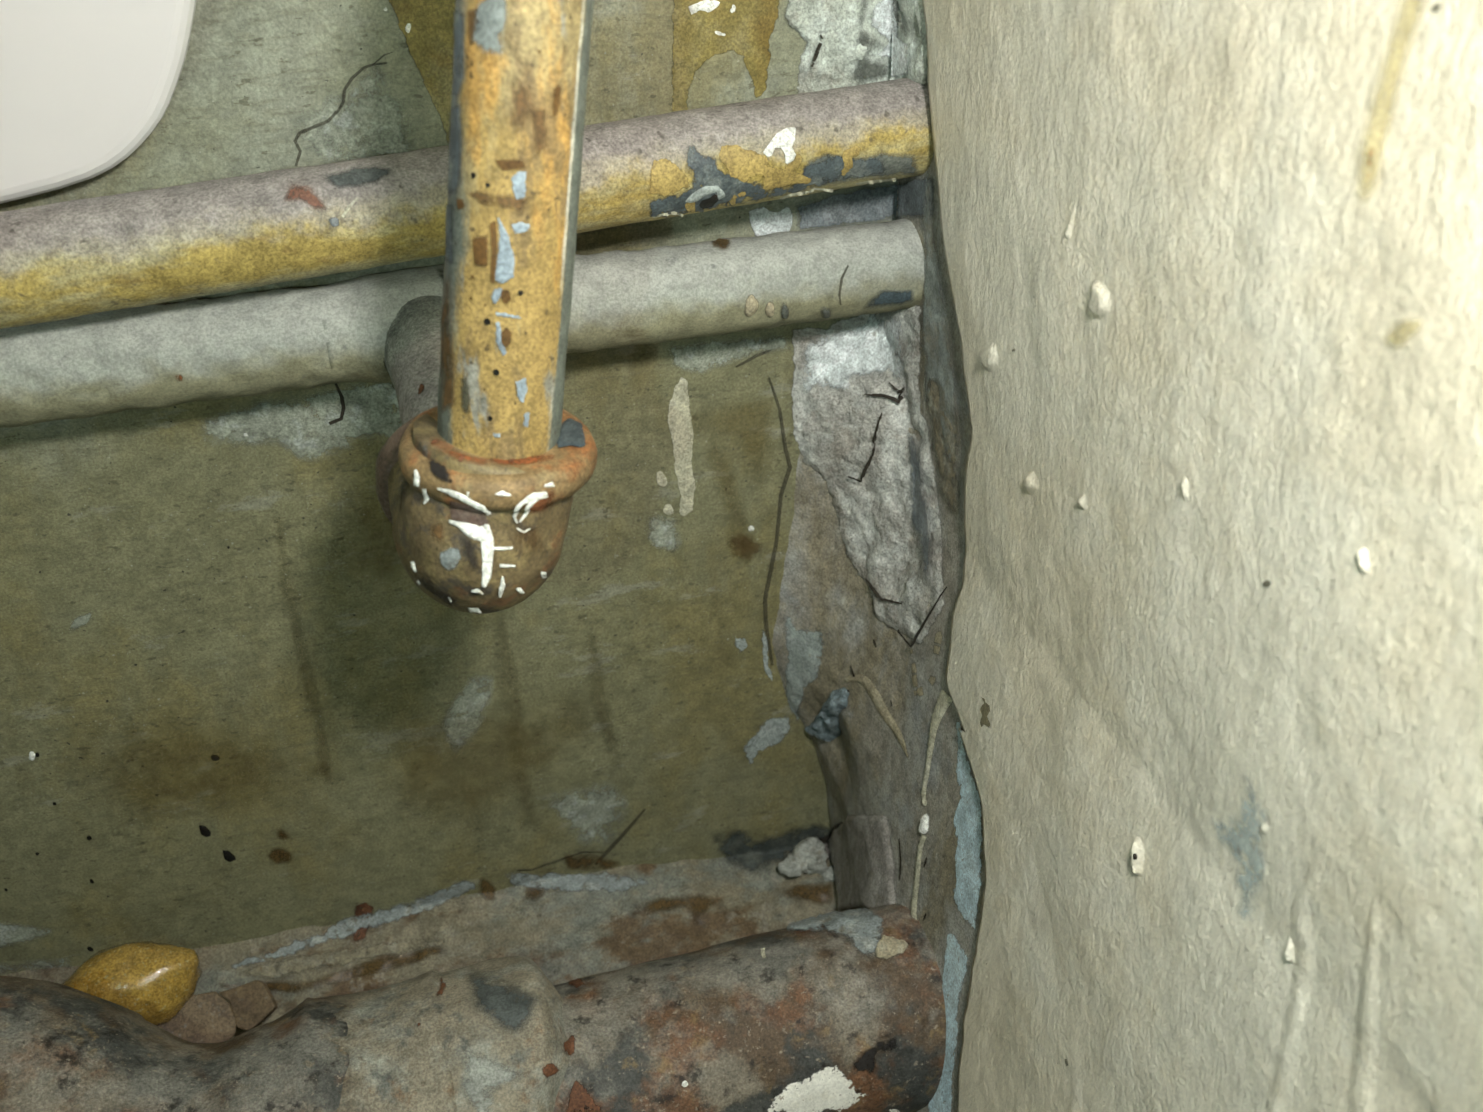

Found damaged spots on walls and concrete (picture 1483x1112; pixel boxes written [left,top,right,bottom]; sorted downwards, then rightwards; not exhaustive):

spalling [785,0,928,94]
crack [294,52,393,167]
spalling [649,145,958,648]